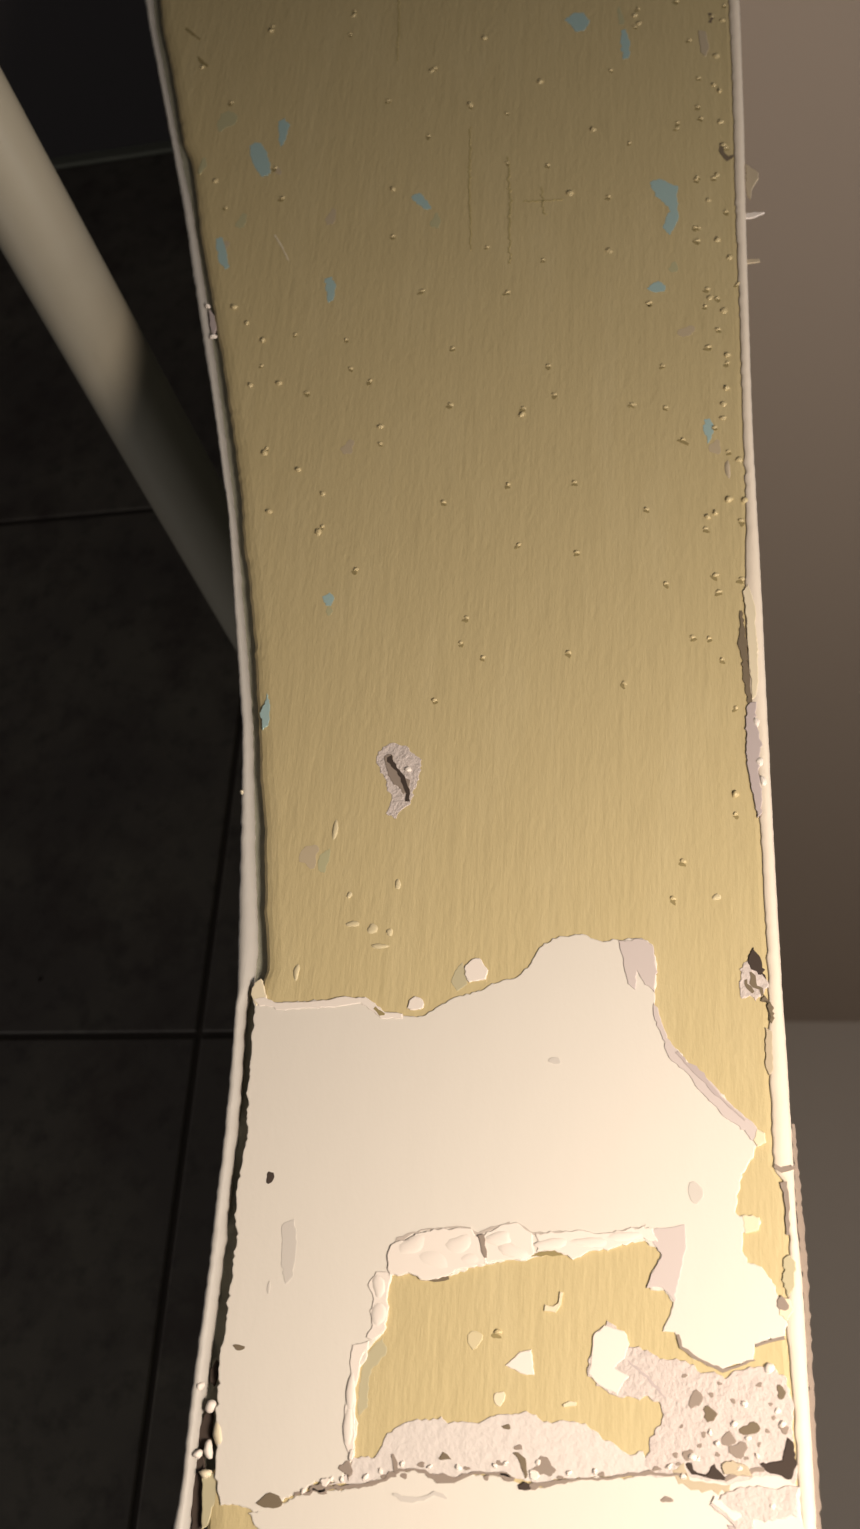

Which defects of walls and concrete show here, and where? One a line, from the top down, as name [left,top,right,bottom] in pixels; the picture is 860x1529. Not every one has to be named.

flaking render [376,743,422,819]
peeling [214,934,804,1529]